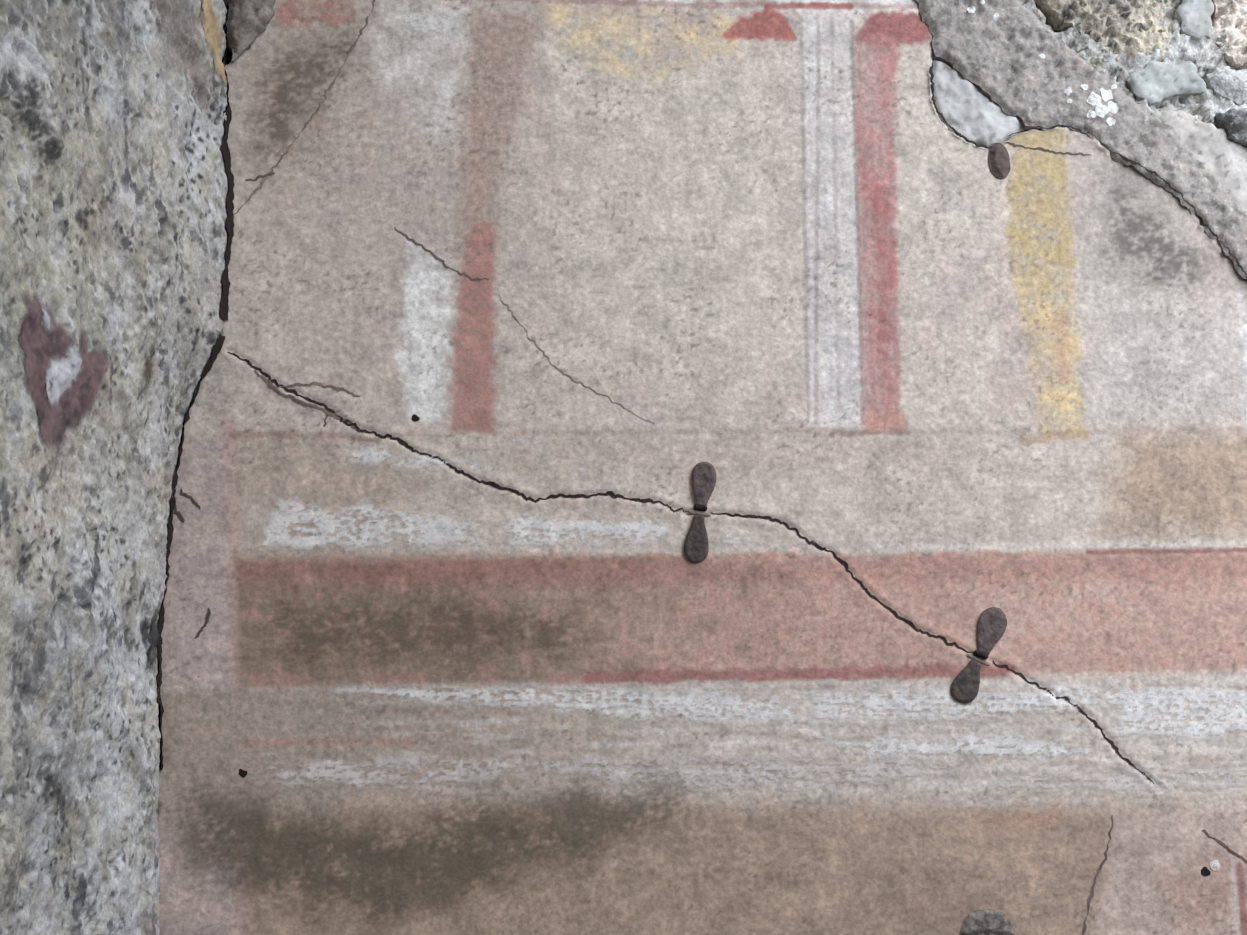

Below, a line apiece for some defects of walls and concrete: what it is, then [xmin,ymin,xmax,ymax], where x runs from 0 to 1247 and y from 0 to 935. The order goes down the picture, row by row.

crack [157,0,1158,788]
water stain [204,797,656,907]
crack [1082,815,1113,935]